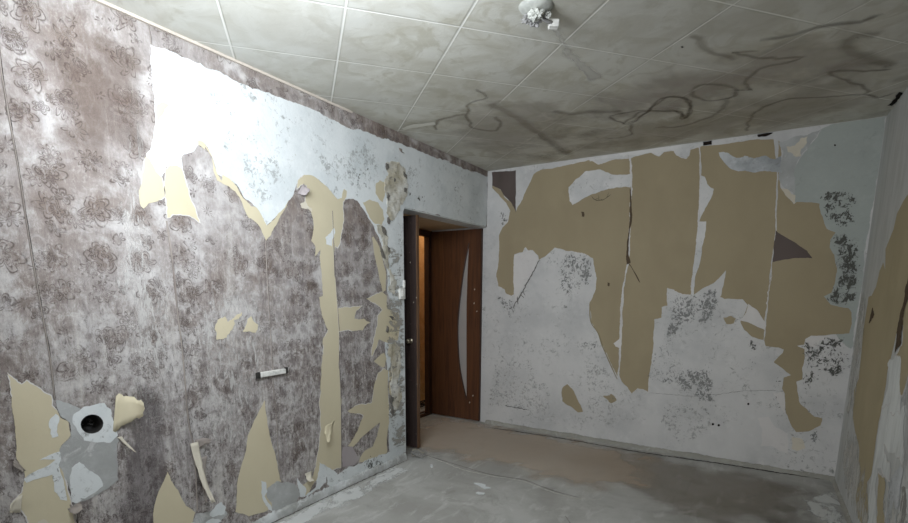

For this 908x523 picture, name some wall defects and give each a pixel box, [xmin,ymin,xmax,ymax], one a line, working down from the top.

flaking render [146,44,488,497]
flaking render [568,169,631,217]
damp [652,290,717,401]
flaking render [691,176,714,295]
flaking render [719,152,782,173]
damp [802,191,865,413]
peeling [24,400,119,504]
flaking render [868,355,908,523]